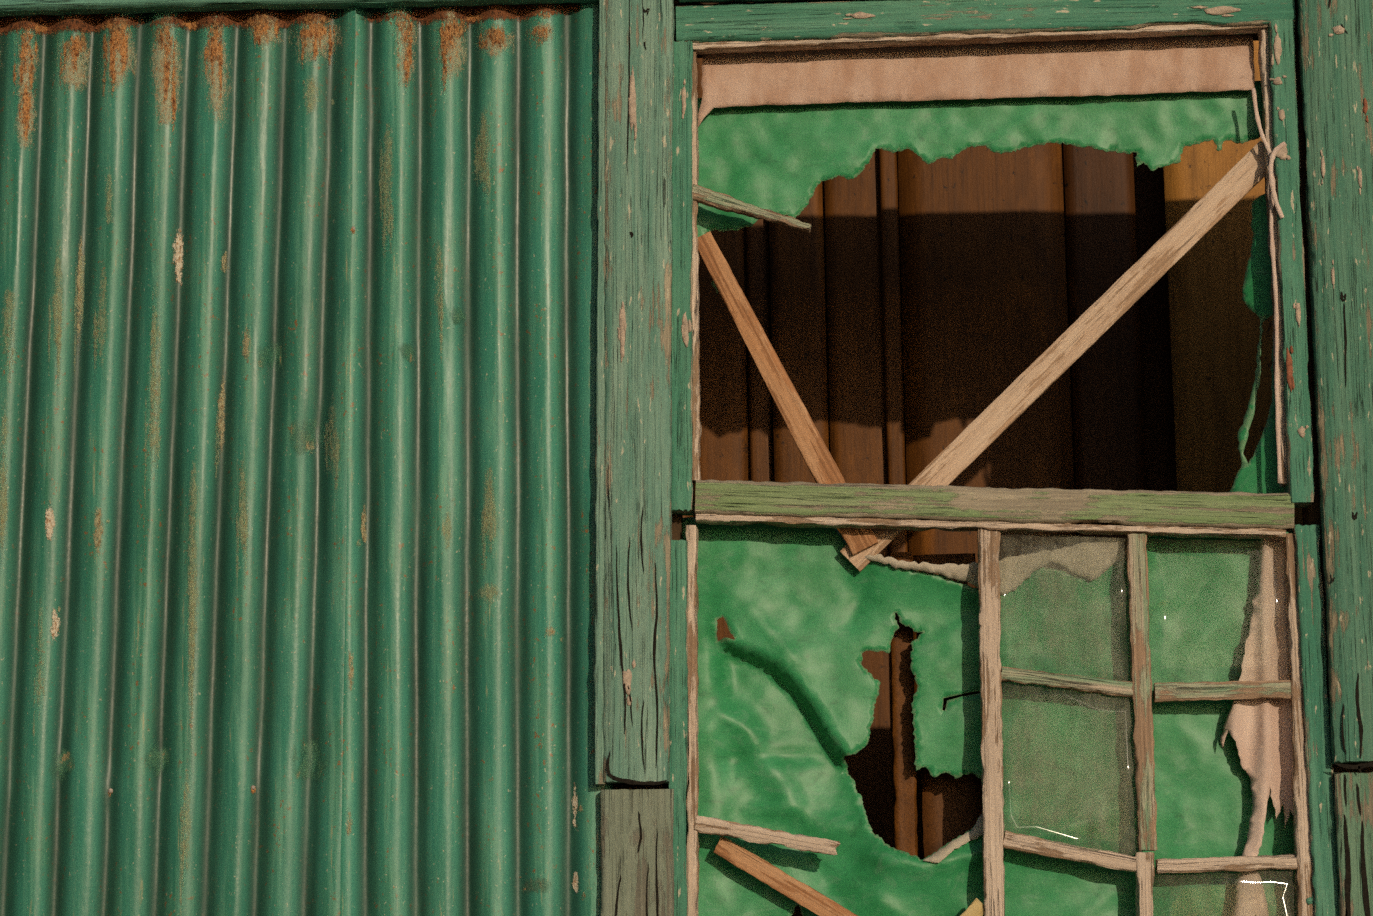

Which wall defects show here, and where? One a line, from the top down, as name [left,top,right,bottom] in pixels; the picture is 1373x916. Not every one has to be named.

corrosion [0,9,343,147]
corrosion [360,4,580,92]
peeling [628,65,637,140]
peeling [618,301,627,362]
crack [606,462,668,916]
crack [1335,673,1373,916]